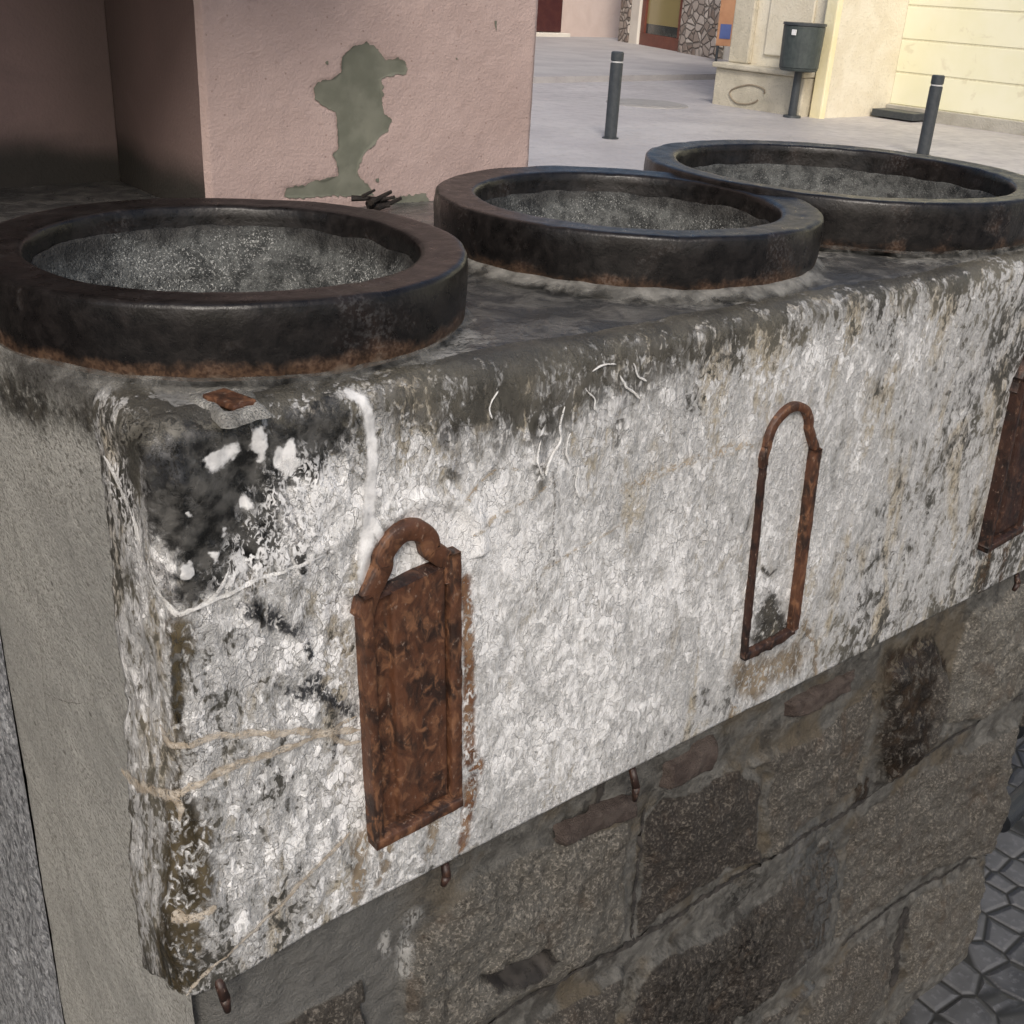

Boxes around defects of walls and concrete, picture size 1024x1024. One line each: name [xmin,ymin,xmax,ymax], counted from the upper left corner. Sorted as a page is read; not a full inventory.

peeling [284,41,408,199]
peeling [391,193,429,203]
leakage [139,312,764,605]
leakage [237,597,303,637]
leakage [169,635,184,723]
corrosion [459,574,483,852]
crack [121,716,361,821]
corrosion [350,830,368,905]
corrosion [378,844,392,884]